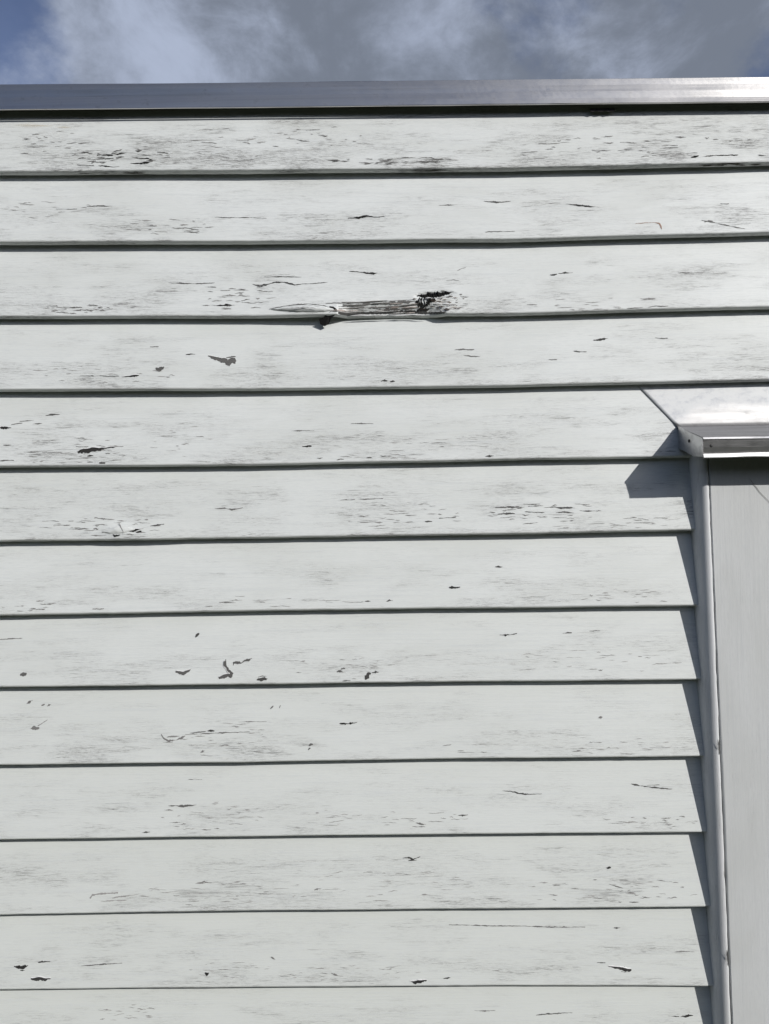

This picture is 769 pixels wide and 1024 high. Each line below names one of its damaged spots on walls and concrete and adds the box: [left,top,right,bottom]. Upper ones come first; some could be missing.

peeling [64,142,162,167]
peeling [594,136,751,159]
peeling [208,355,236,366]
peeling [30,437,127,464]
peeling [218,658,252,679]
peeling [14,961,51,981]